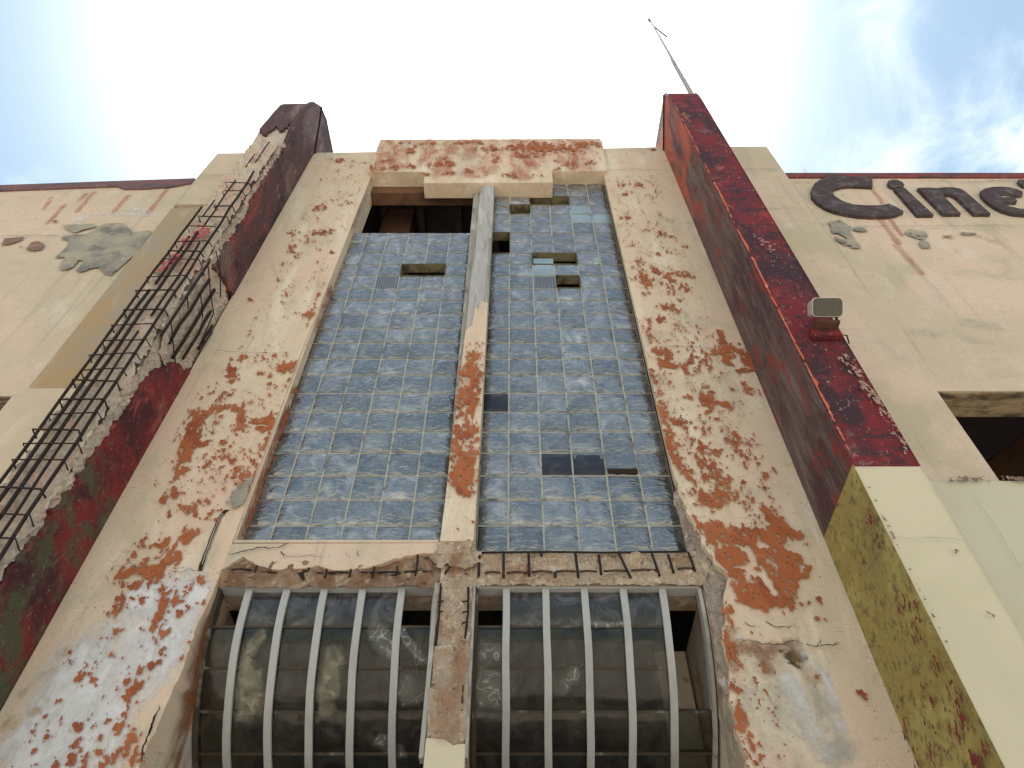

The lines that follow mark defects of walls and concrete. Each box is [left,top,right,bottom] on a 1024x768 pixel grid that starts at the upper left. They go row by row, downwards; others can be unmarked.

peeling [675,106,878,465]
leakage [0,570,211,768]
crack [175,510,316,573]
spalling [0,139,827,768]
crack [737,621,838,647]